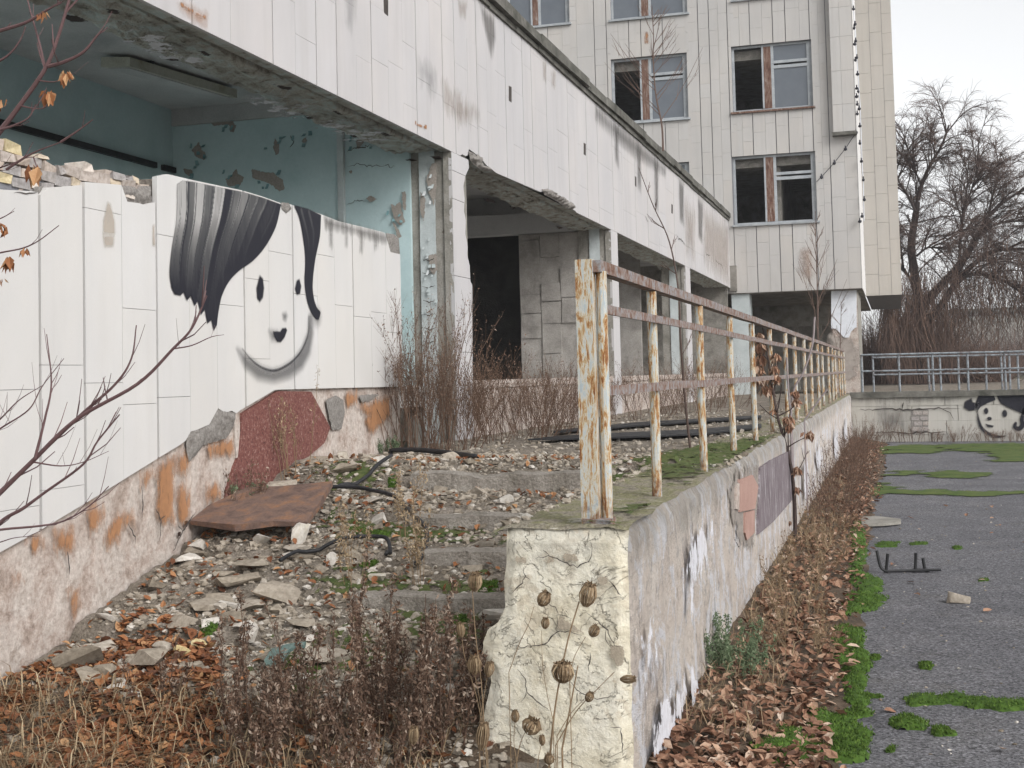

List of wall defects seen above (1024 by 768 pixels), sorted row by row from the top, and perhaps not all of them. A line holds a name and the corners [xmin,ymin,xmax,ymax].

damp [484,12,494,46]
flaking render [0,138,152,204]
peeling [222,169,291,213]
peeling [386,191,406,254]
spalling [469,151,491,171]
spalling [542,189,576,210]
damp [597,112,658,199]
crack [512,544,592,593]
peeling [683,518,714,614]
crack [515,604,621,709]
peeling [635,619,657,696]
peeling [653,666,699,757]